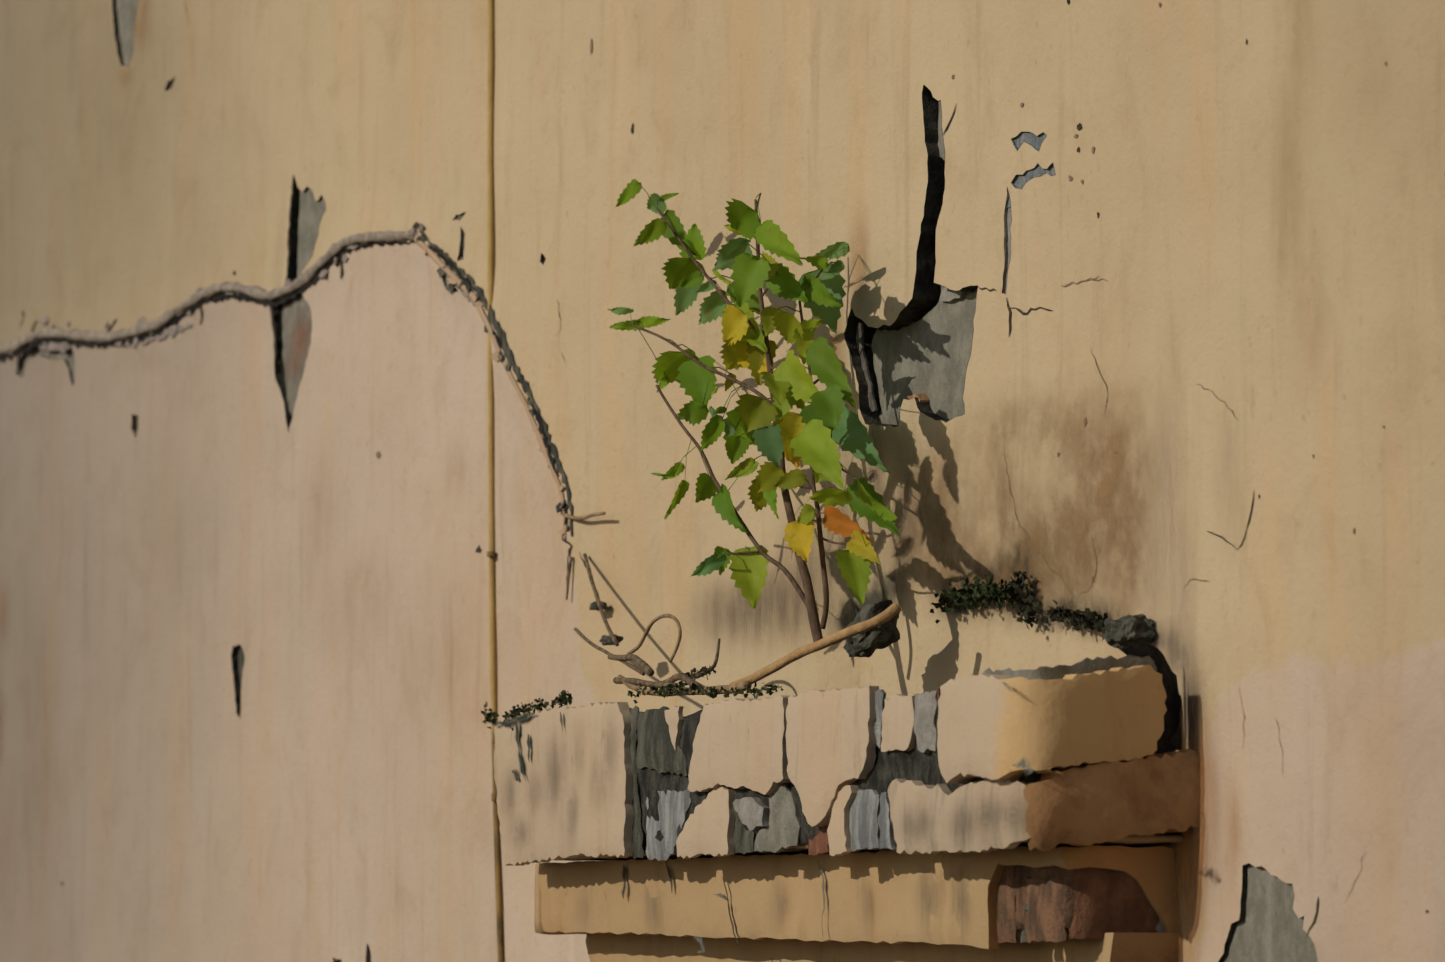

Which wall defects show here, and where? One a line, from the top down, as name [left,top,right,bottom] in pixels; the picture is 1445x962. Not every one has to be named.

flaking render [112,0,140,66]
flaking render [269,174,326,433]
flaking render [844,85,978,427]
peeling [1002,131,1083,294]
crack [0,179,586,587]
damp [912,425,1133,612]
flaking render [231,645,245,718]
flaking render [636,706,691,861]
flaking render [733,784,829,856]
flaking render [849,789,896,852]
flaking render [913,689,941,753]
flaking render [1218,863,1317,962]